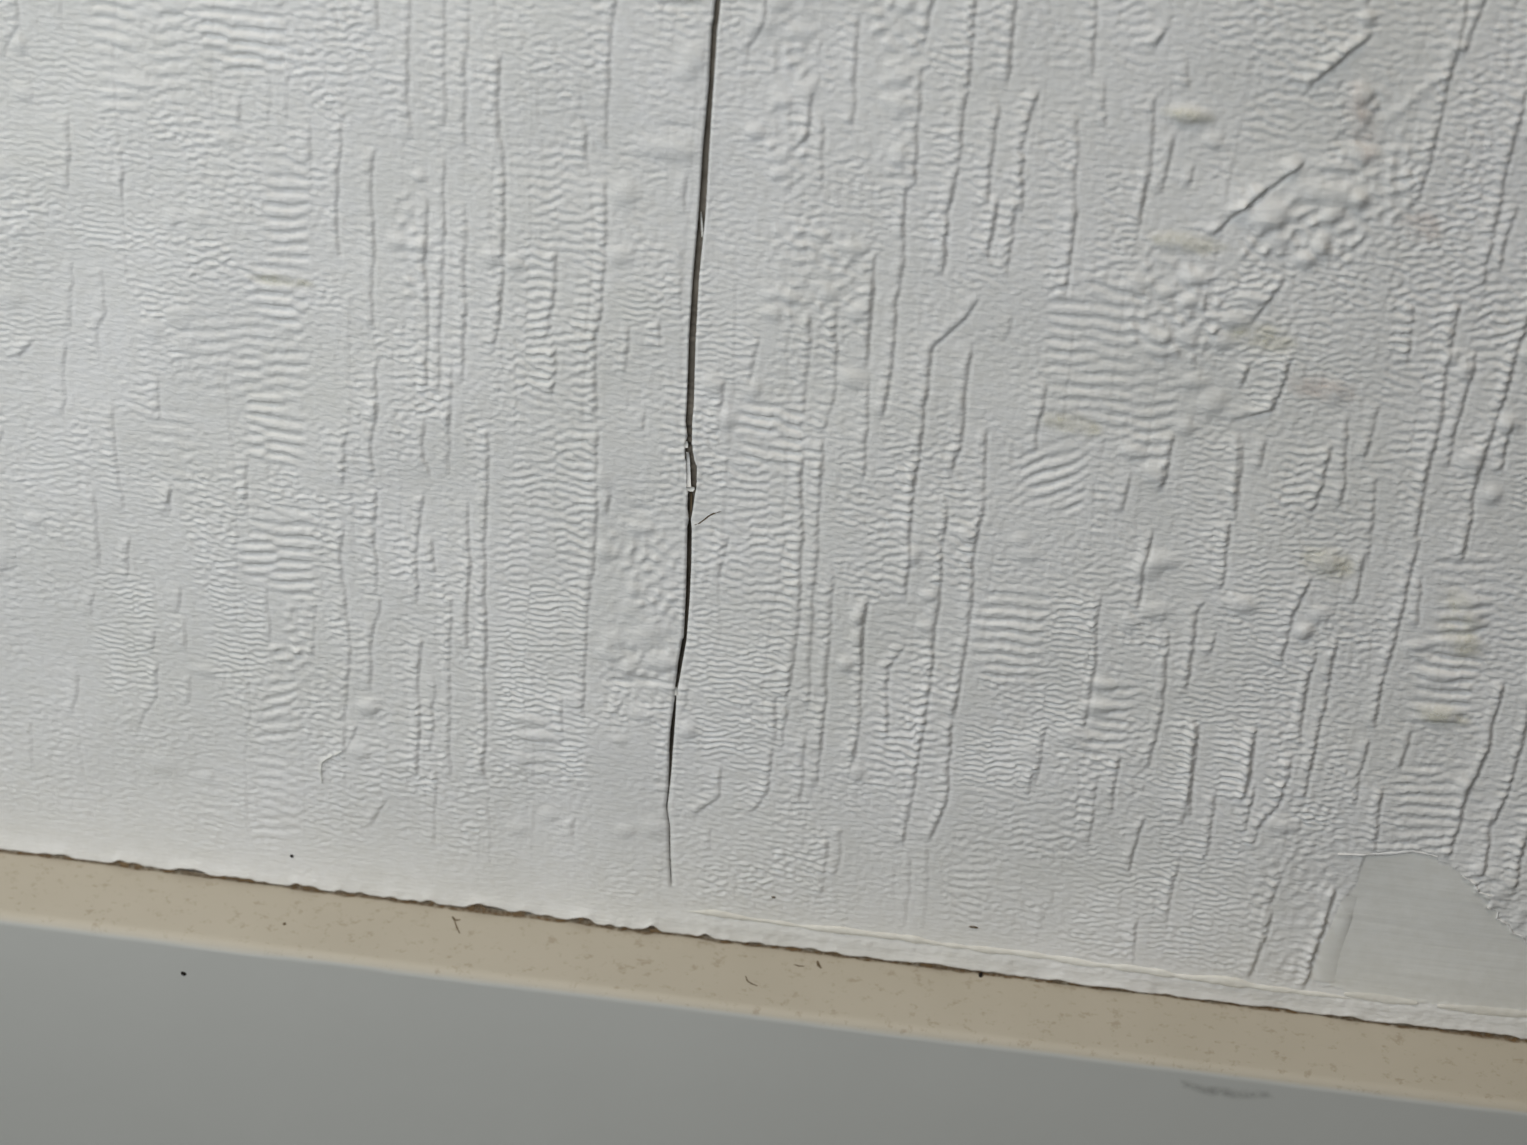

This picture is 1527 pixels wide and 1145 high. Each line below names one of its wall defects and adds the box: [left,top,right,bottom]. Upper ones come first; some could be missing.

crack [666,0,721,885]